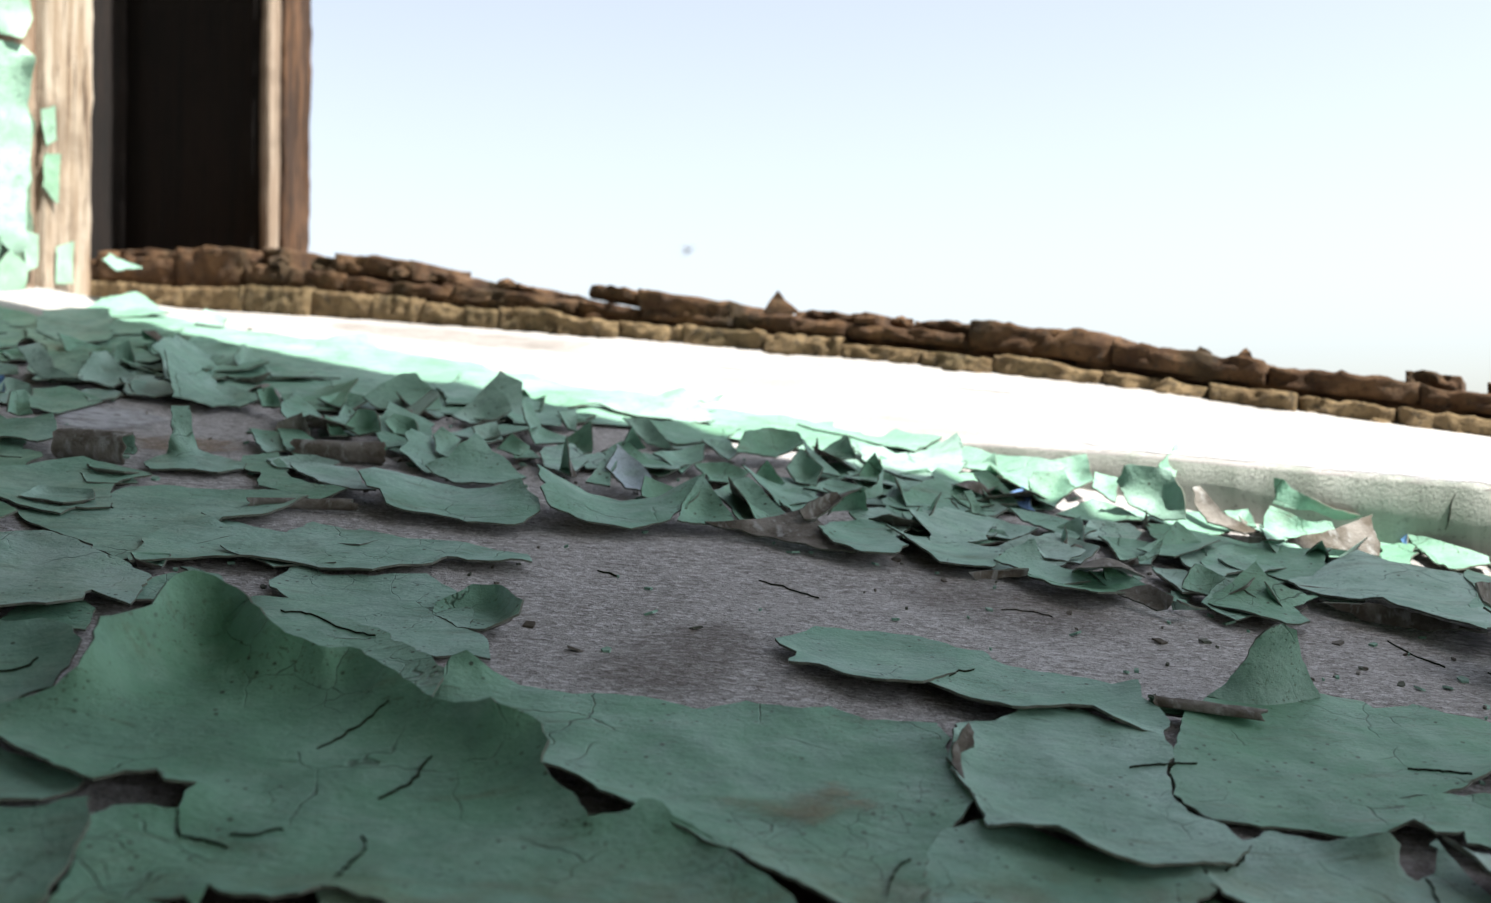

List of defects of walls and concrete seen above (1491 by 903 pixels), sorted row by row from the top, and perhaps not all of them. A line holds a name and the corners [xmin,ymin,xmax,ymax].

peeling [0,0,61,292]
peeling [55,241,74,284]
peeling [0,292,1491,903]
crack [280,609,376,636]
crack [0,656,38,672]
crack [317,700,389,749]
crack [378,755,433,800]
crack [177,808,283,848]
crack [335,835,367,878]